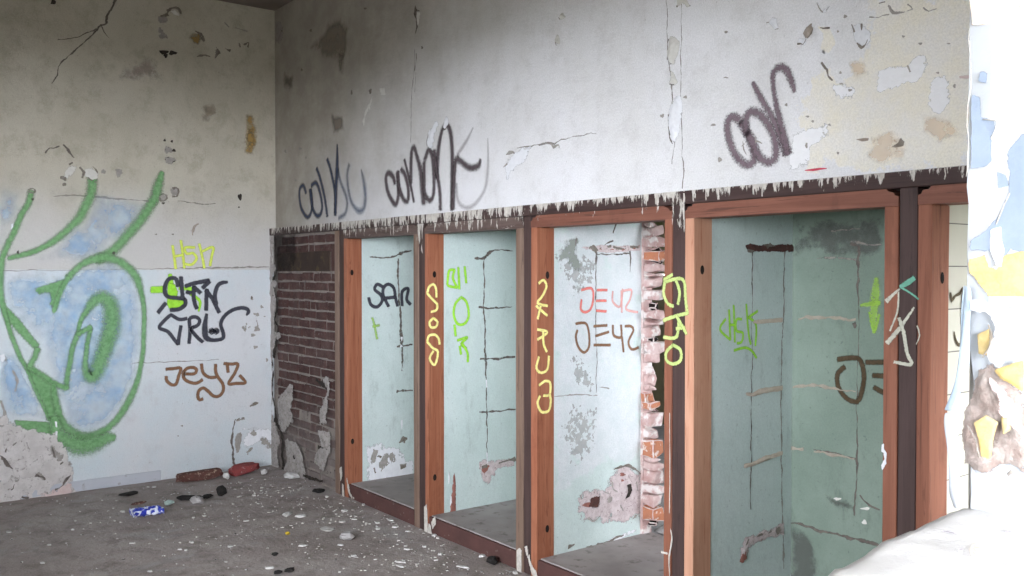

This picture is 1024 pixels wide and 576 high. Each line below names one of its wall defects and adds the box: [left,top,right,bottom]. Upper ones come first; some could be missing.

crack [52,0,117,83]
crack [519,133,596,149]
peeling [235,0,1024,549]
spalling [0,400,76,502]